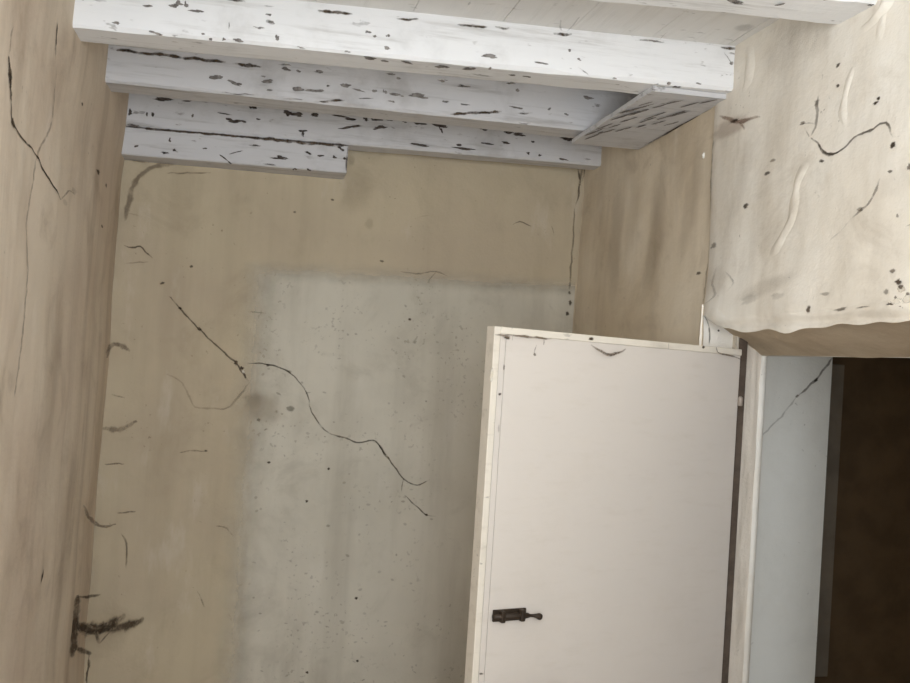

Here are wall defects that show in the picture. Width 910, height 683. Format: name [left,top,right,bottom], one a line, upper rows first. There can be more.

peeling [340,83,428,103]
crack [8,57,59,194]
peeling [333,115,447,133]
peeling [453,131,541,156]
peeling [585,100,714,139]
crack [819,122,895,156]
crack [796,360,831,397]
crack [161,282,427,516]